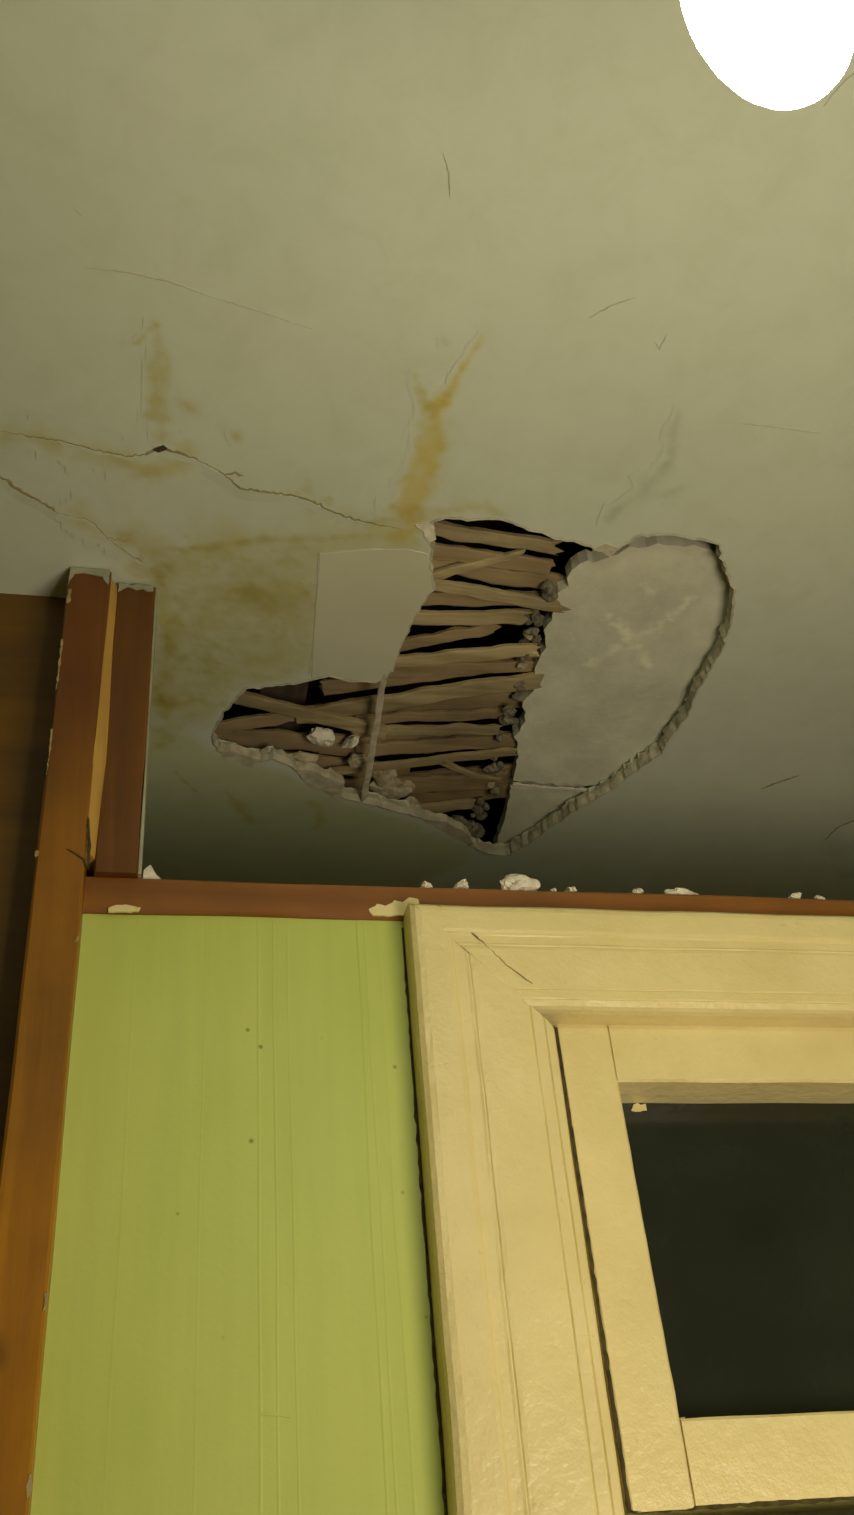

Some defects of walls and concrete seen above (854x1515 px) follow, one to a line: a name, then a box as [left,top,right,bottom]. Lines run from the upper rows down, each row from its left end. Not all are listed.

water stain [0,314,384,735]
crack [0,431,400,671]
flaking render [141,516,736,917]